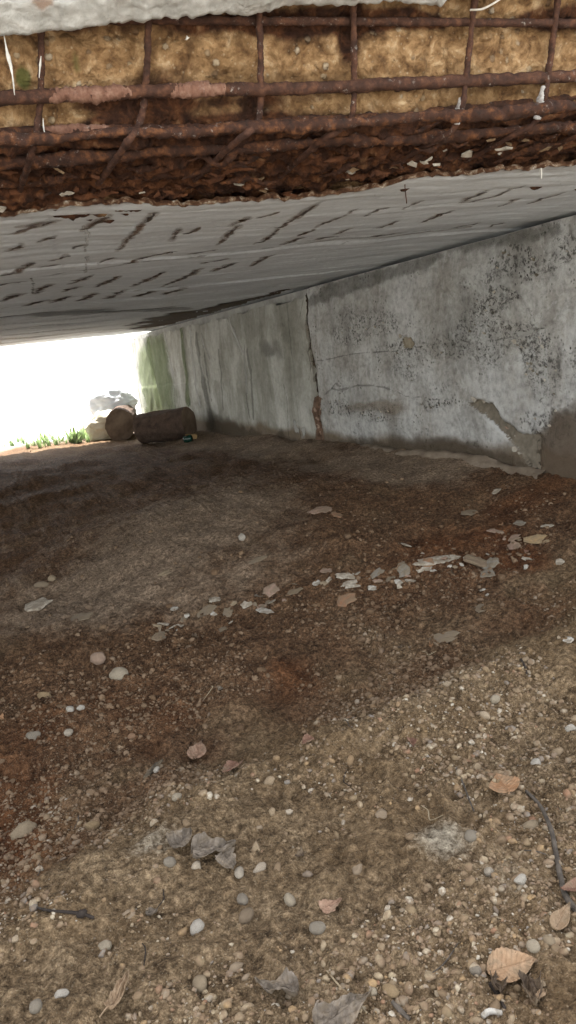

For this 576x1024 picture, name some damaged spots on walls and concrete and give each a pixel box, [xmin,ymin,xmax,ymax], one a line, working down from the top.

spalling [0,0,576,224]
crack [305,294,322,424]
spalling [467,396,572,469]